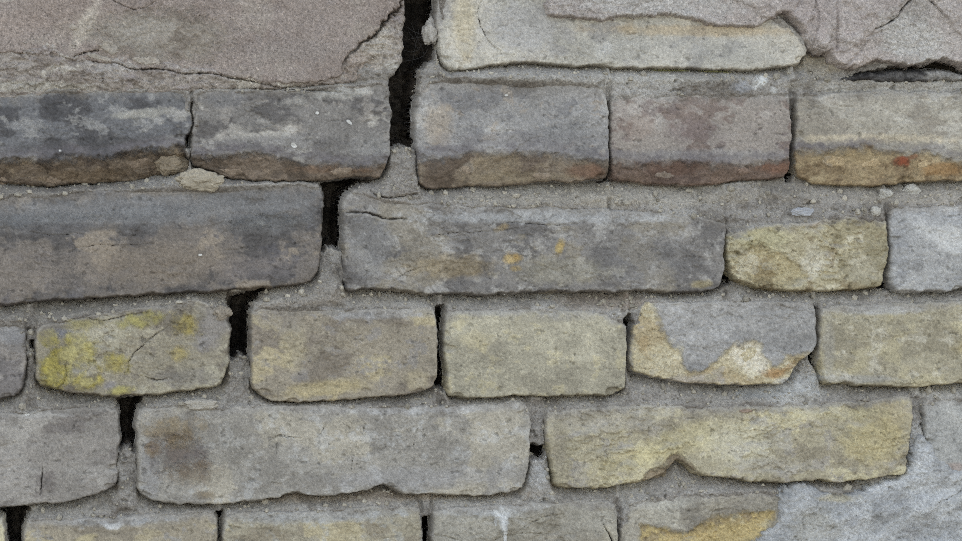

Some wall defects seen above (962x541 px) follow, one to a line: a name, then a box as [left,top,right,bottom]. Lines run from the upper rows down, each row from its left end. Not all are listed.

crack [119,64,255,82]
crack [388,0,434,147]
spalling [0,146,386,187]
spalling [417,145,962,189]
crack [320,178,410,251]
spalling [791,207,814,217]
spalling [738,245,808,286]
crack [226,288,269,357]
spalling [630,302,810,385]
crack [116,378,164,446]
spalling [641,455,694,481]
crack [0,472,43,541]